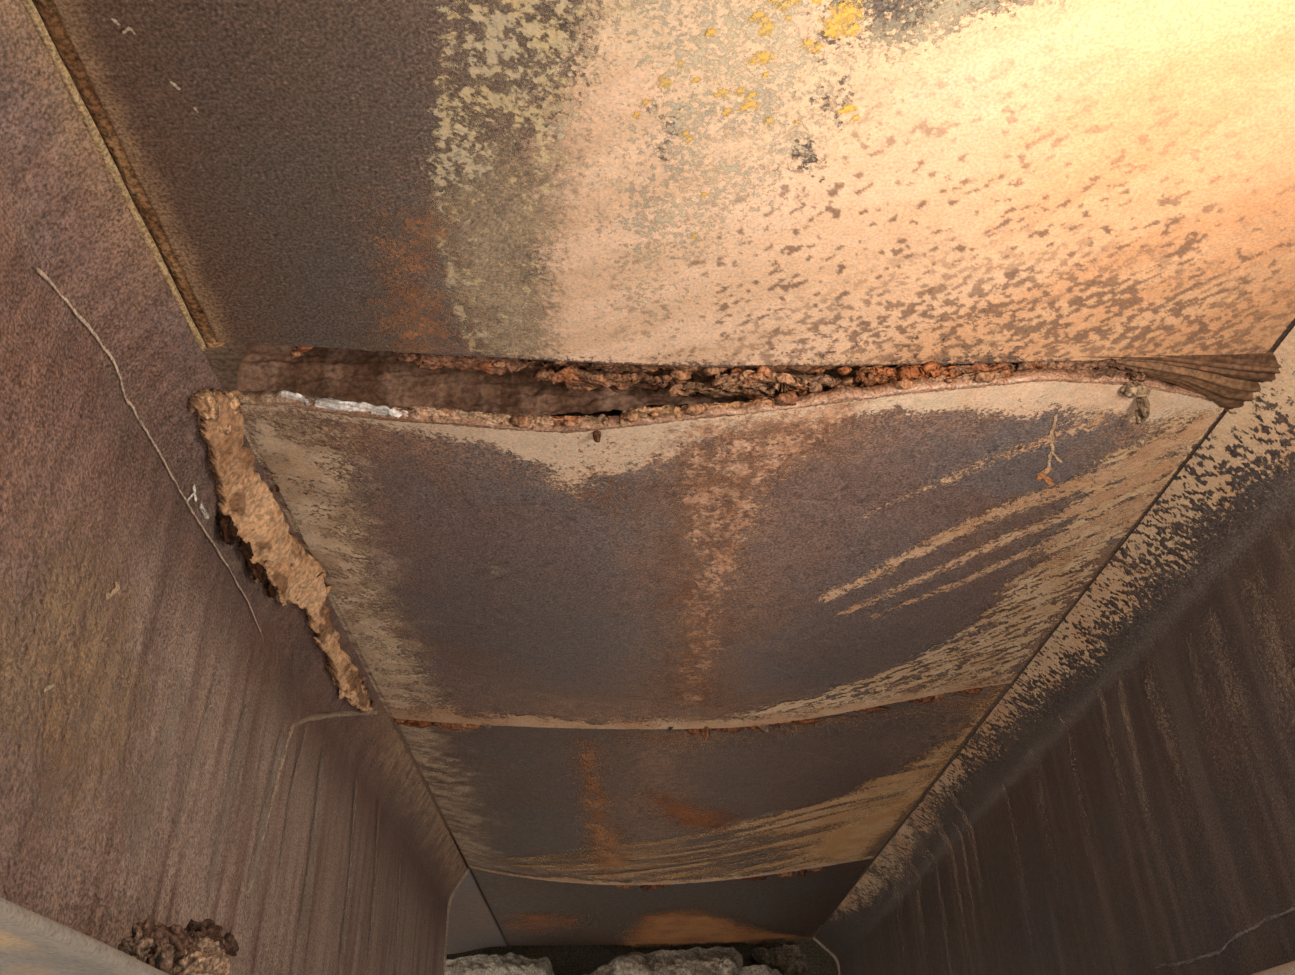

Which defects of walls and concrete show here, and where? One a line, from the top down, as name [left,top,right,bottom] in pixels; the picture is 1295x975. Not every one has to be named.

corrosion [369,0,1295,922]